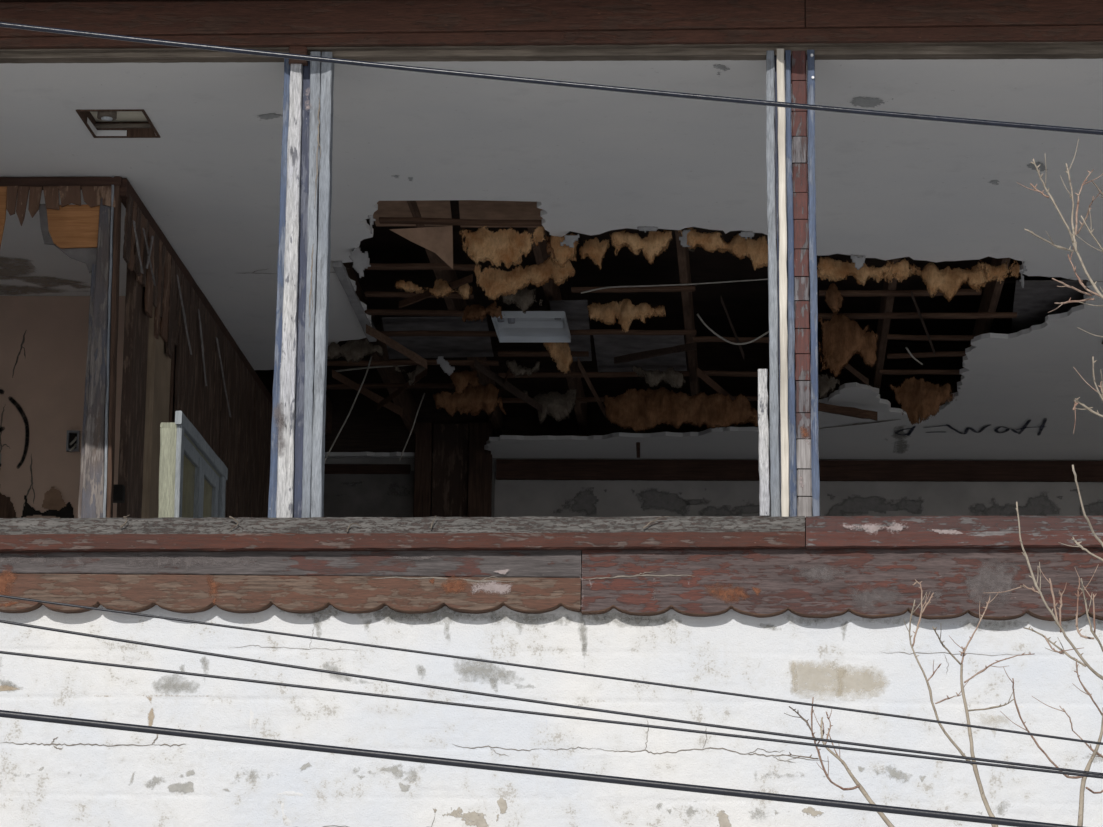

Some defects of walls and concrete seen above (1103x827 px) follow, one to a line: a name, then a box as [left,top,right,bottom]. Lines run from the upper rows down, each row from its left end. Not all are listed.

spalling [0,487,74,518]
flaking render [633,489,760,517]
flaking render [826,495,923,533]
flaking render [970,489,1080,516]
flaking render [1080,502,1103,516]
peeling [130,557,254,567]
peeling [429,569,513,594]
crack [453,721,823,763]